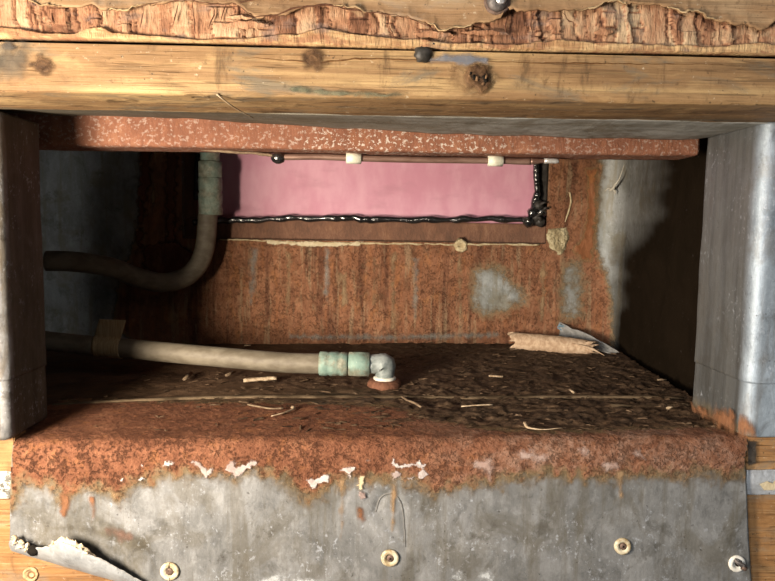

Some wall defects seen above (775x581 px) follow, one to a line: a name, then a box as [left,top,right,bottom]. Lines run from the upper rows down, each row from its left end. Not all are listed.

peeling [224,14,270,30]
corrosion [112,152,614,347]
peeling [191,461,213,478]
peeling [225,460,257,476]
corrosion [10,399,756,524]
peeling [391,459,428,480]
peeling [308,474,329,489]
peeling [341,467,366,499]